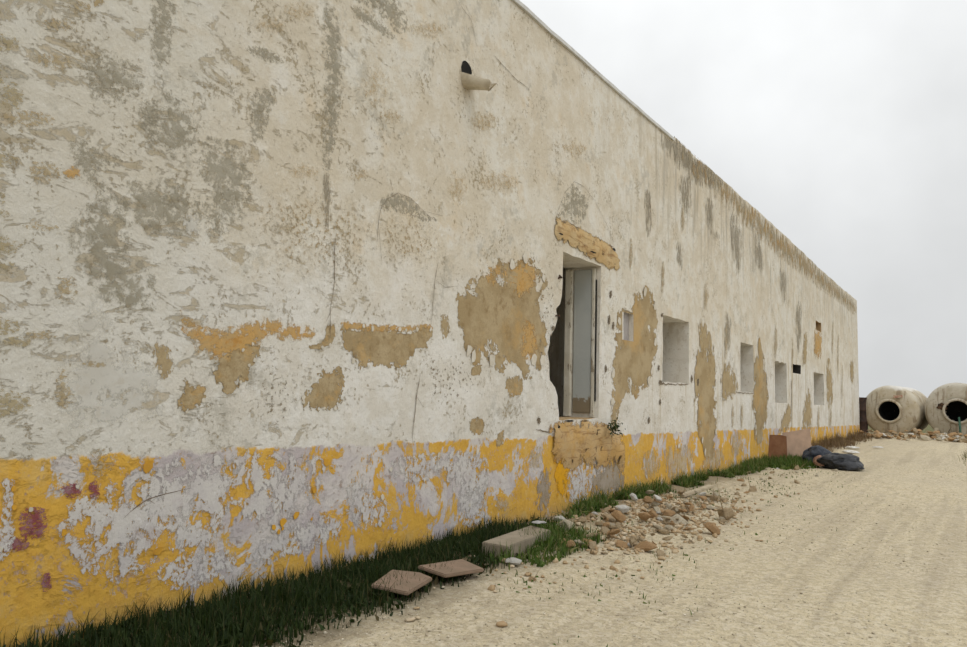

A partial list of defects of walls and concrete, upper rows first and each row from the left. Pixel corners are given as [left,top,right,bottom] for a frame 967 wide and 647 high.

flaking render [554,217,620,271]
flaking render [152,342,174,379]
flaking render [177,342,261,413]
flaking render [263,253,554,422]
flaking render [529,286,663,511]
flaking render [643,319,769,480]
flaking render [779,404,791,434]
flaking render [803,389,812,432]
peeling [0,478,17,561]